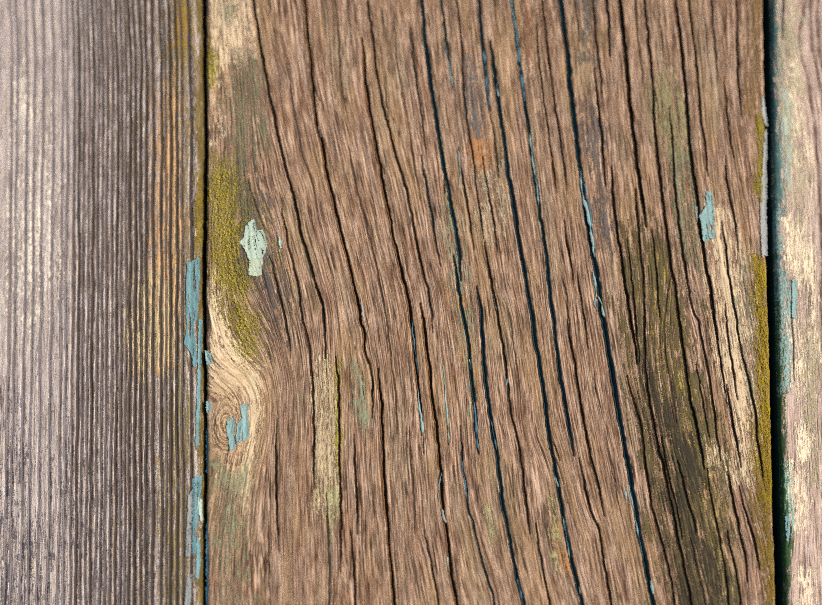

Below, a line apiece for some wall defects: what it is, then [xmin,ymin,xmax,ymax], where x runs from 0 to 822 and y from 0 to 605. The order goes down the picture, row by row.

damp [0,0,206,605]
peeling [184,257,213,605]
peeling [226,404,250,451]
peeling [239,219,267,277]
damp [219,44,302,361]
crack [247,0,763,605]
damp [632,345,735,605]
peeling [695,191,715,243]
damp [730,257,760,425]
peeling [759,0,798,398]
peeling [779,461,795,542]